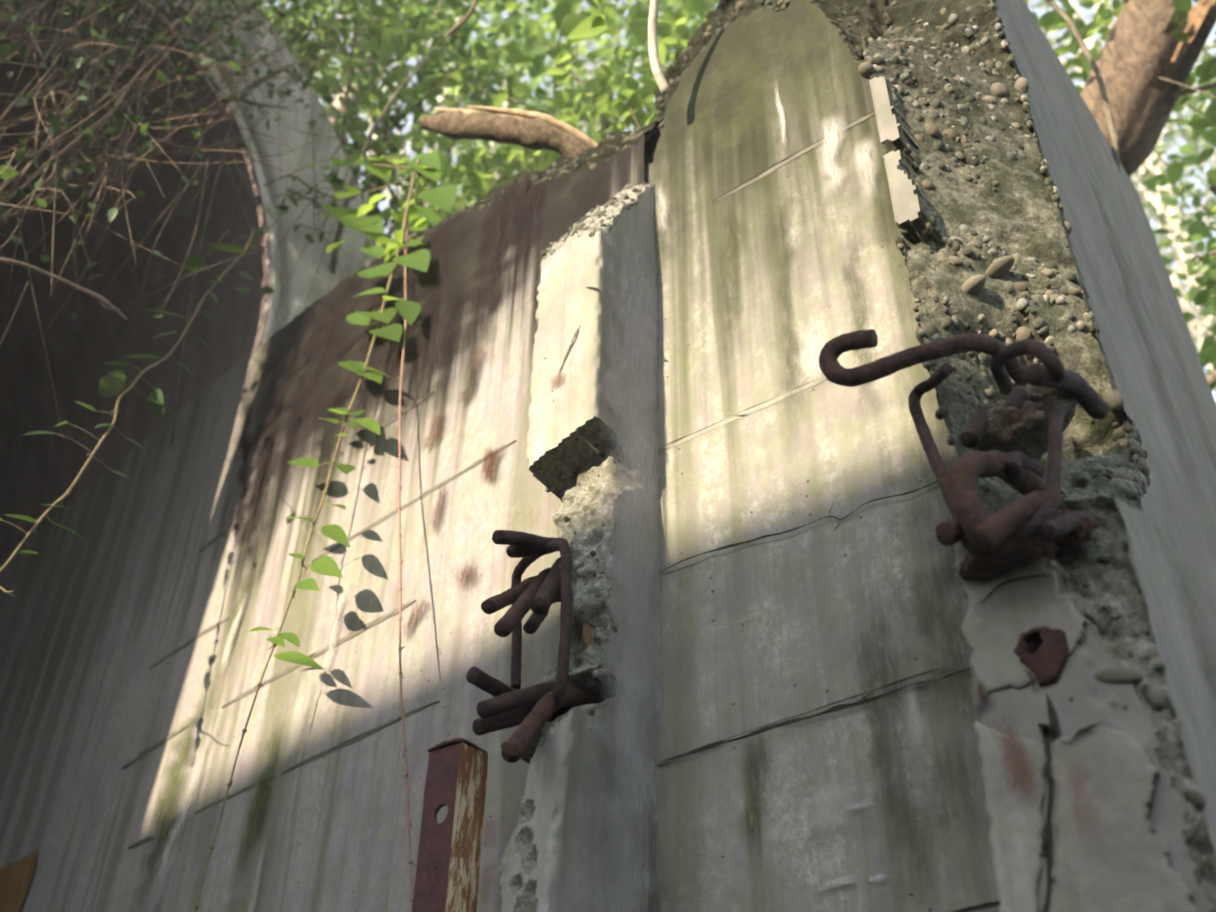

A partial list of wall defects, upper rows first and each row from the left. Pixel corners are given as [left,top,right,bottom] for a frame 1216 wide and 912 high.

spalling [402,0,794,243]
spalling [542,182,656,261]
efflorescence [824,124,840,182]
efflorescence [857,145,871,184]
leakage [233,168,541,571]
leakage [787,330,822,375]
spalling [809,0,1216,912]
spalling [520,416,648,764]
rust [1014,626,1069,687]
crack [1024,669,1106,912]
spalling [499,791,539,912]